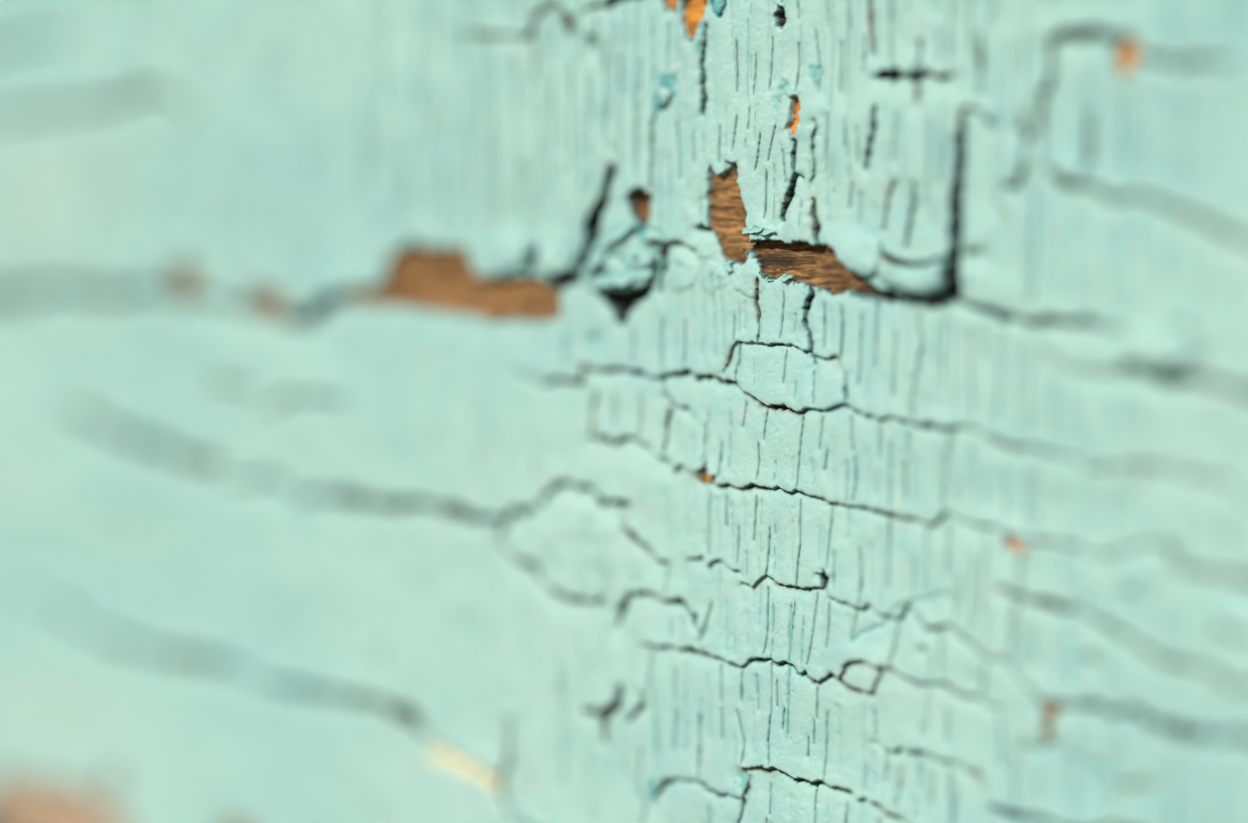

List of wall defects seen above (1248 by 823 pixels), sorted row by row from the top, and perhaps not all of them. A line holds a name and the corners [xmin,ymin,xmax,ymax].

crack [464,0,629,84]
peeling [660,0,708,40]
peeling [1112,32,1141,80]
crack [524,0,985,291]
peeling [784,96,800,141]
crack [1002,26,1236,191]
peeling [704,112,967,310]
peeling [337,239,568,326]
peeling [582,187,654,327]
crack [297,223,1248,823]
peeling [0,768,128,823]